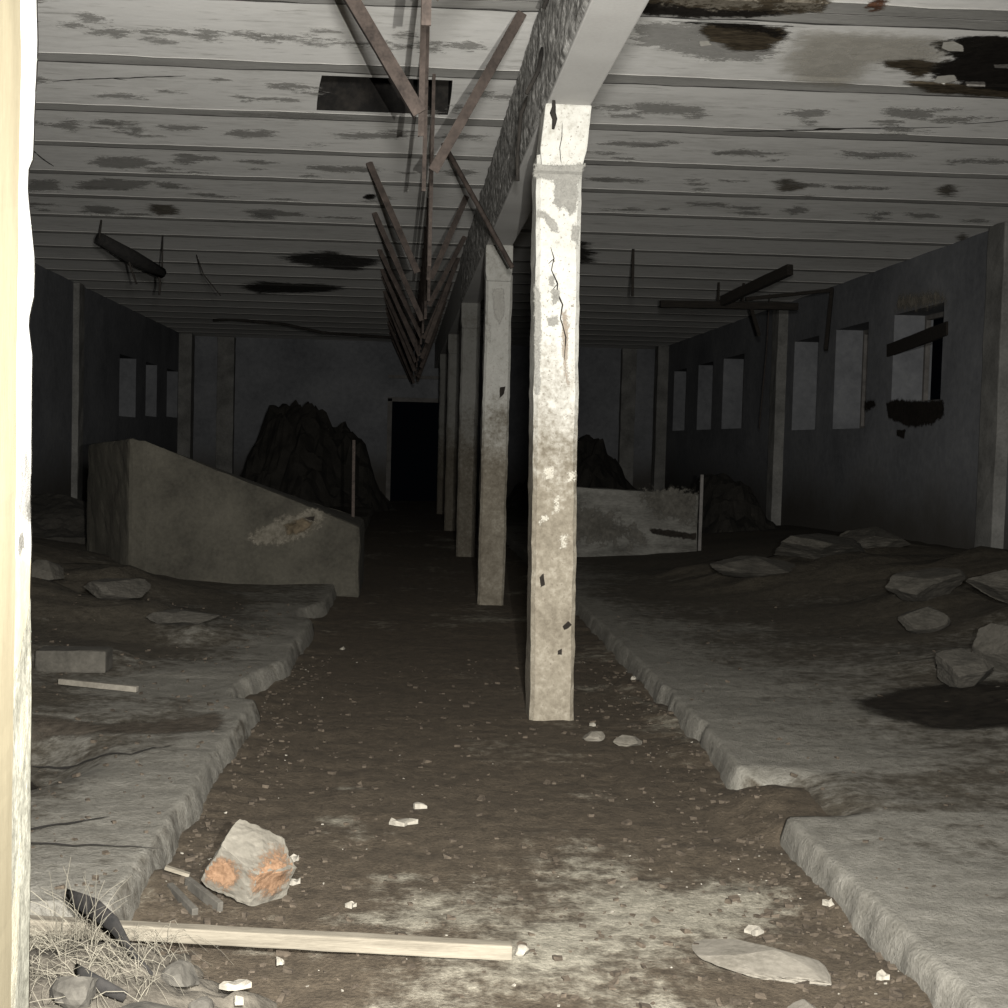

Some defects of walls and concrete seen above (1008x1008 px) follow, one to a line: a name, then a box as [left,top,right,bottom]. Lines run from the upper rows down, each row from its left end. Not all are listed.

damp [642,0,830,18]
damp [865,0,888,12]
damp [273,250,389,271]
crack [548,249,566,360]
spalling [886,399,944,439]
spalling [248,508,325,546]